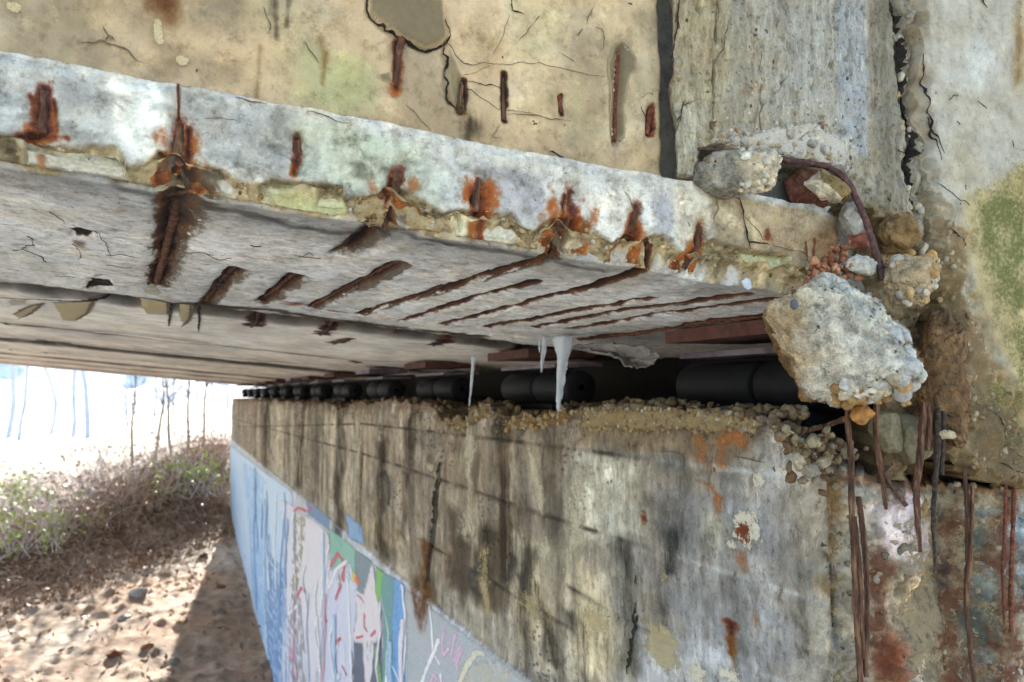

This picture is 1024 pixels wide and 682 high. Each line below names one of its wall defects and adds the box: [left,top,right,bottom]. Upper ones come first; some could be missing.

corrosion [13,80,70,147]
corrosion [150,84,218,195]
crack [443,0,605,138]
crack [889,1,987,257]
spalling [86,274,114,294]
spalling [127,154,779,347]
corrosion [463,175,501,240]
corrosion [539,182,599,257]
spalling [442,89,1024,682]
water stain [333,405,360,536]
water stain [375,440,388,557]
water stain [458,411,593,668]